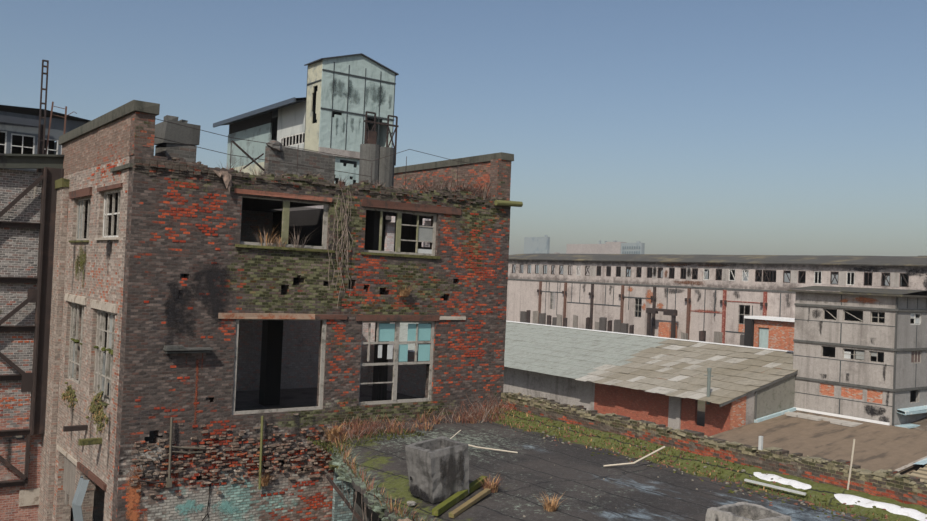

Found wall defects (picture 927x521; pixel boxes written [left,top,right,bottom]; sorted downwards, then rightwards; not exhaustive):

water stain [165,281,195,361]
spalling [261,480,332,521]